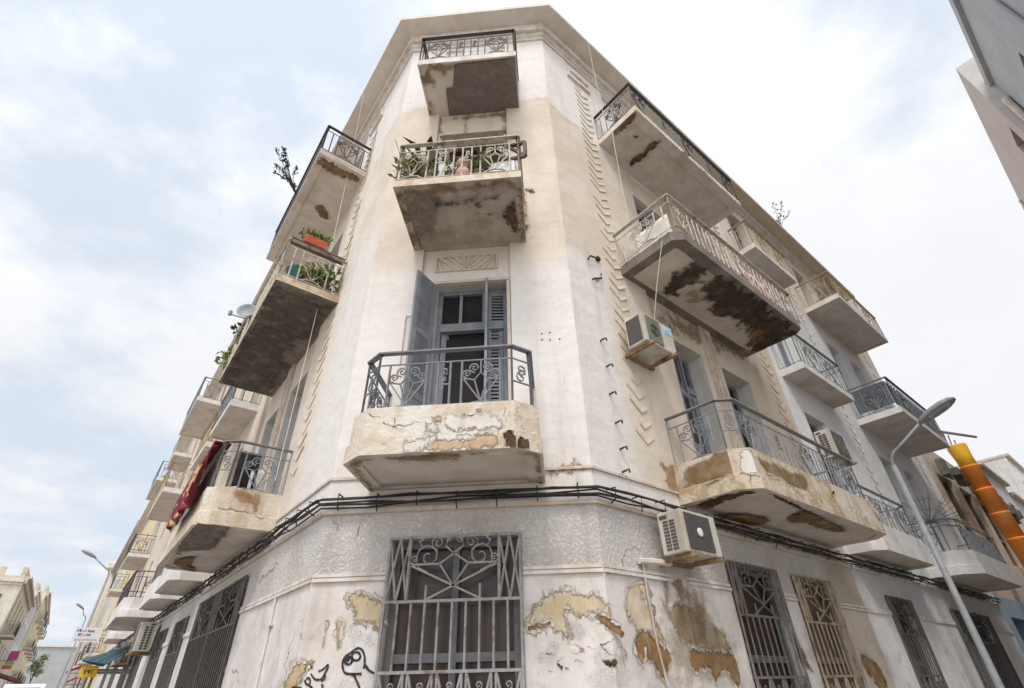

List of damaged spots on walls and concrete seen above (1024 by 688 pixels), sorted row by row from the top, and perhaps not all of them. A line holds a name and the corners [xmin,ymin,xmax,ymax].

damp [420,63,453,84]
spalling [317,157,359,182]
damp [397,179,535,246]
damp [660,261,797,358]
damp [224,282,330,394]
peeling [403,408,530,453]
peeling [740,448,757,473]
spalling [699,491,770,526]
spalling [769,494,846,533]
peeling [322,588,389,650]
peeling [524,579,744,688]
peeling [860,651,888,688]